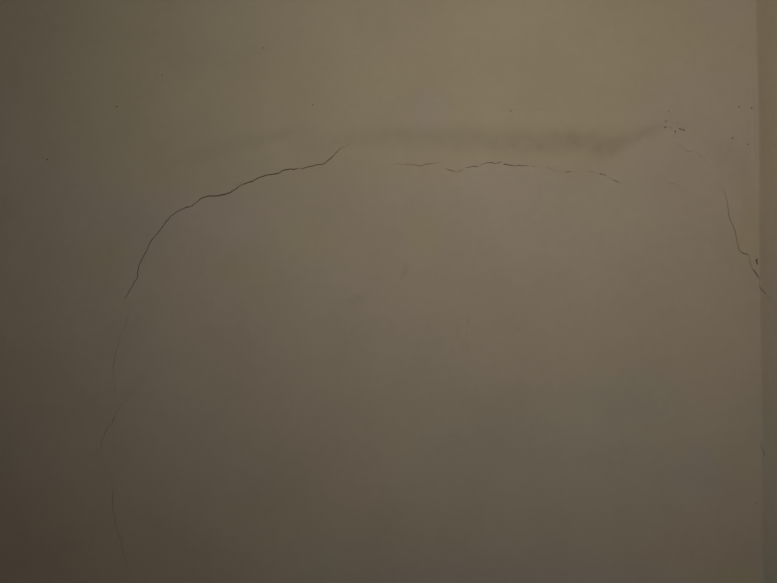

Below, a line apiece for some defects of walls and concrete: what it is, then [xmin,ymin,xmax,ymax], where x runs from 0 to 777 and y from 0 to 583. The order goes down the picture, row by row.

crack [129,154,335,291]